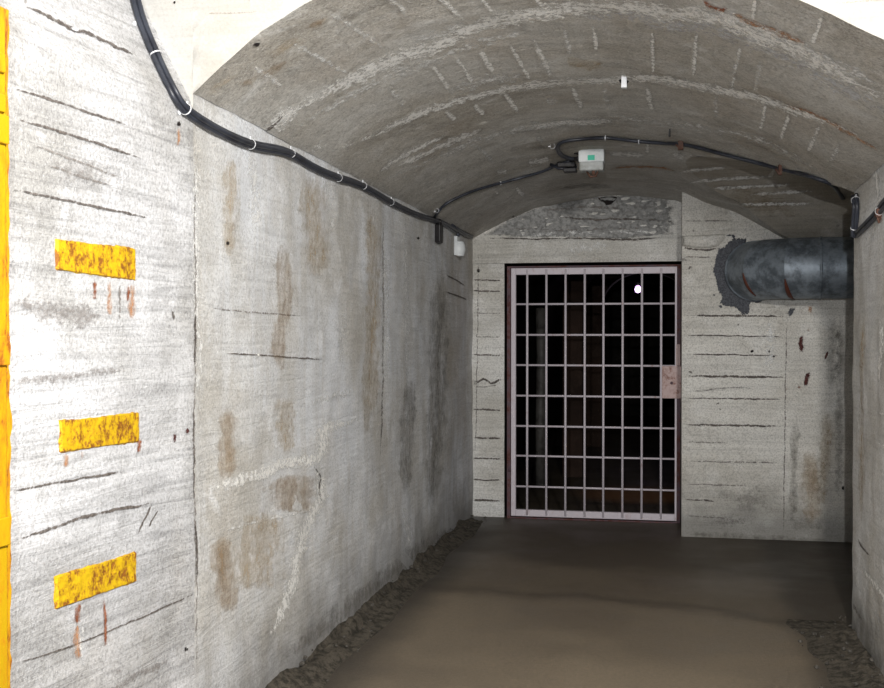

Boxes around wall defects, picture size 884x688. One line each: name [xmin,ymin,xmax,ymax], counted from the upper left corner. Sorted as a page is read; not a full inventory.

corrosion [107,286,134,317]
crack [228,352,315,360]
crack [15,146,203,661]
crack [231,467,322,529]
corrosion [73,605,84,656]